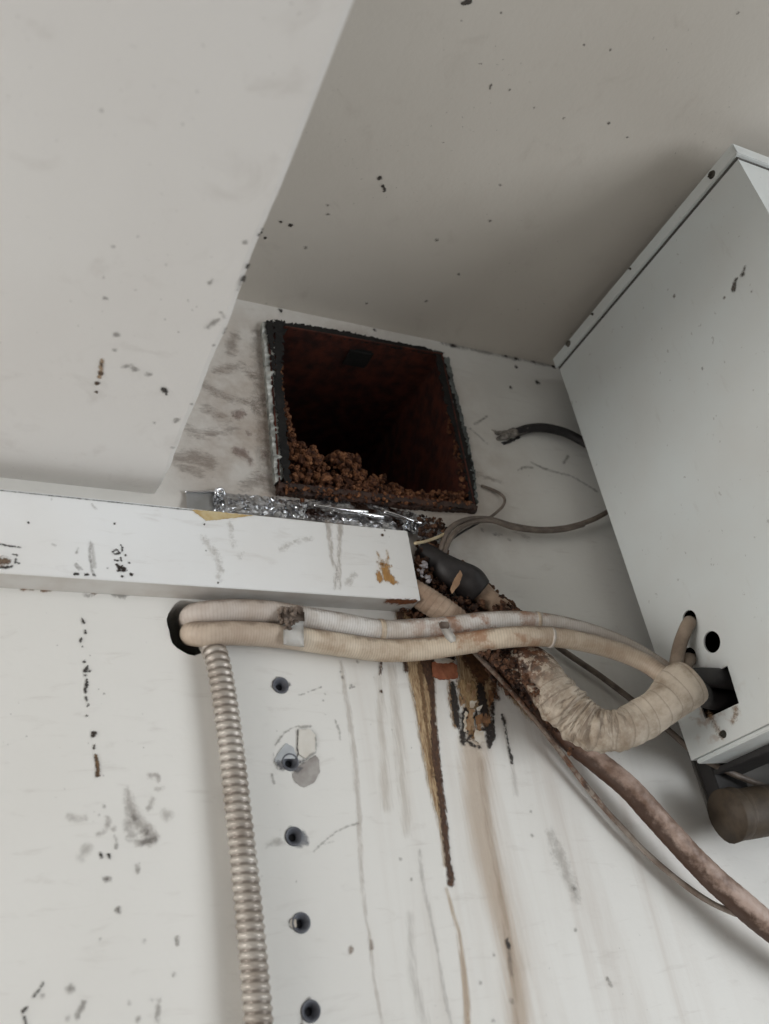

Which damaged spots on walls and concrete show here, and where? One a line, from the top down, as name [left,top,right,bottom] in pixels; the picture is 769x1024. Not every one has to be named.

corrosion [376,553,398,585]
peeling [432,656,496,749]
corrosion [403,660,455,887]